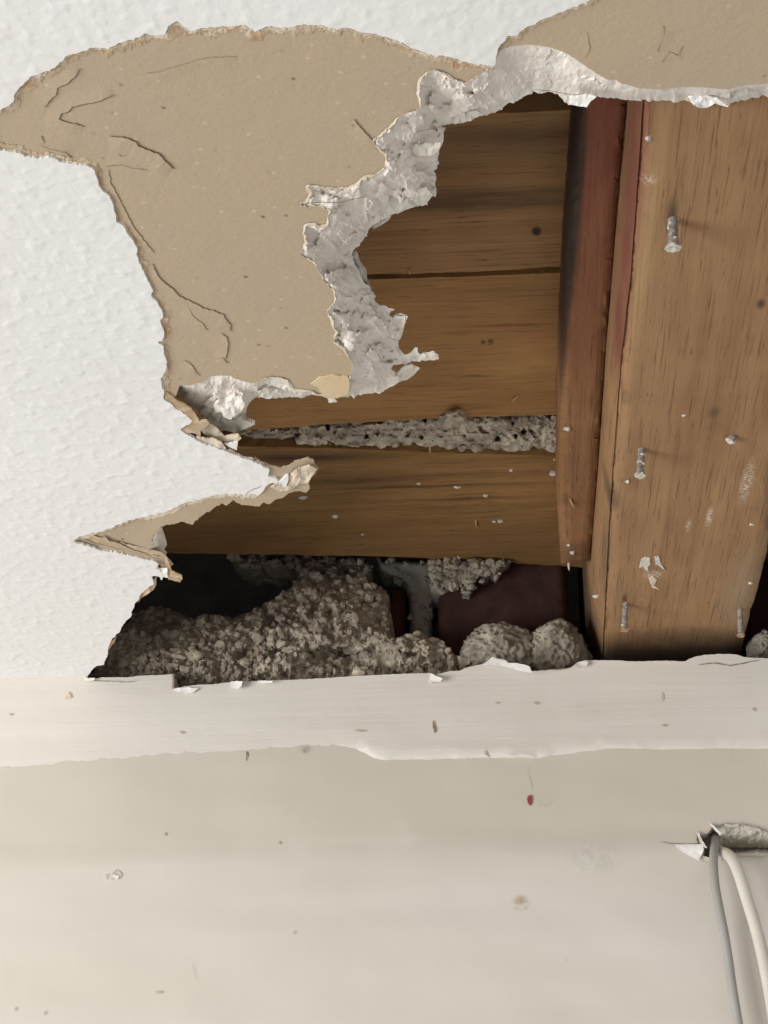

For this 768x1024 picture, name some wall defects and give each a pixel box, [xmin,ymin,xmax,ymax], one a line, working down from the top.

peeling [0,0,768,433]
spalling [75,457,319,640]
spalling [294,554,430,587]
spalling [483,657,532,673]
spalling [172,675,198,694]
peeling [675,844,704,861]